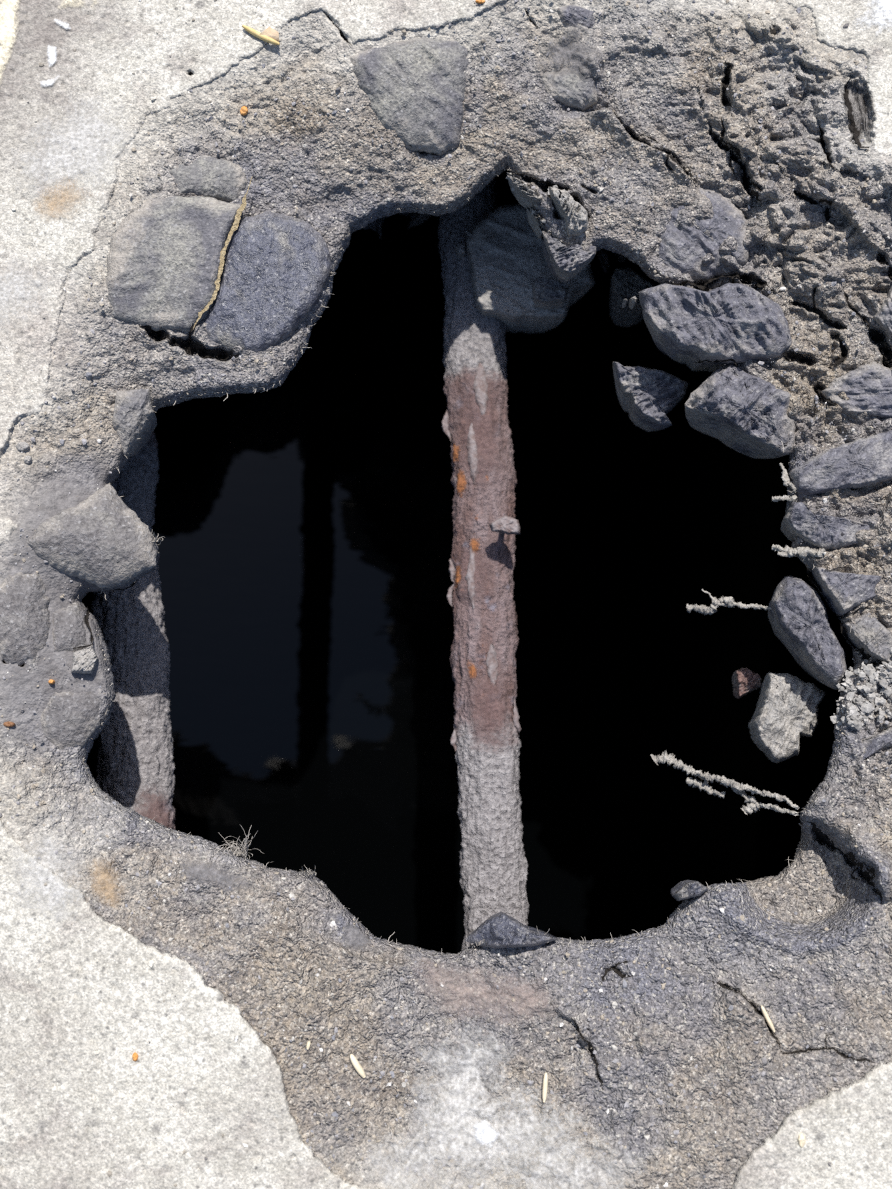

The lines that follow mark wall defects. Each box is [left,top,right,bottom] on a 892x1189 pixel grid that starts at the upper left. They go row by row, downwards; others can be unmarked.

crack [708,61,761,202]
crack [819,125,833,168]
spalling [841,80,875,148]
crack [139,178,252,360]
peeling [507,172,543,209]
peeling [527,208,557,278]
peeling [549,187,589,237]
crack [793,190,833,223]
crack [666,272,892,406]
corrosion [438,178,529,951]
spalling [785,480,892,635]
spalling [843,645,887,687]